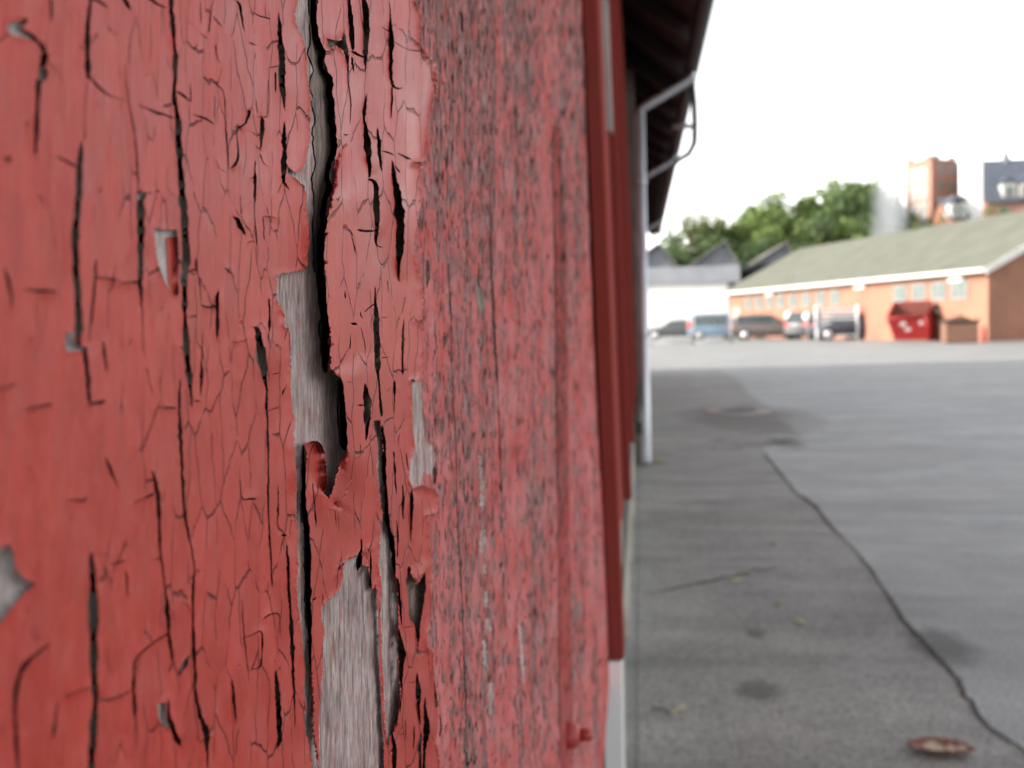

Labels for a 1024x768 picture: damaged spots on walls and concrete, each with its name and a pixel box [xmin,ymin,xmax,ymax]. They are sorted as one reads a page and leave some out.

peeling [0,544,35,622]
crack [0,0,288,768]
peeling [154,228,180,296]
crack [231,306,323,746]
peeling [276,0,428,768]
crack [369,385,468,768]
peeling [409,379,436,488]
crack [344,0,502,510]